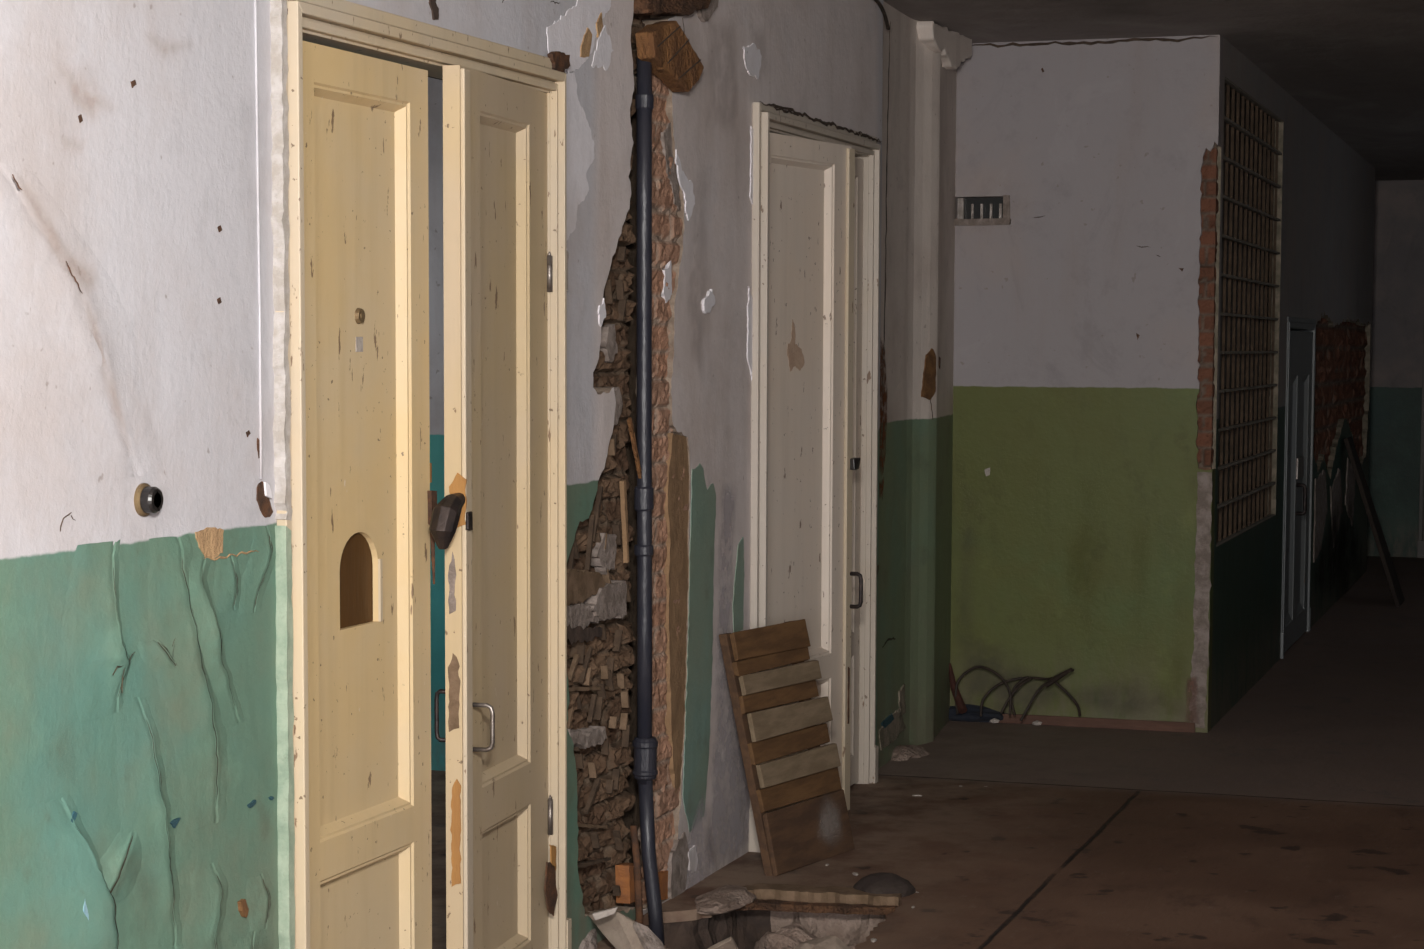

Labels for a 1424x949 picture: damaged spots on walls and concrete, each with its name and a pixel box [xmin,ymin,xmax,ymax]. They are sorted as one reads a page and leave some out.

flaking render [696,0,719,22]
peeling [742,43,762,79]
peeling [546,0,613,250]
peeling [787,319,805,371]
flaking render [567,15,716,914]
flaking render [1179,143,1219,728]
flaking render [1313,318,1368,563]
flaking render [195,527,224,560]
peeling [732,537,744,632]
spalling [647,883,902,949]